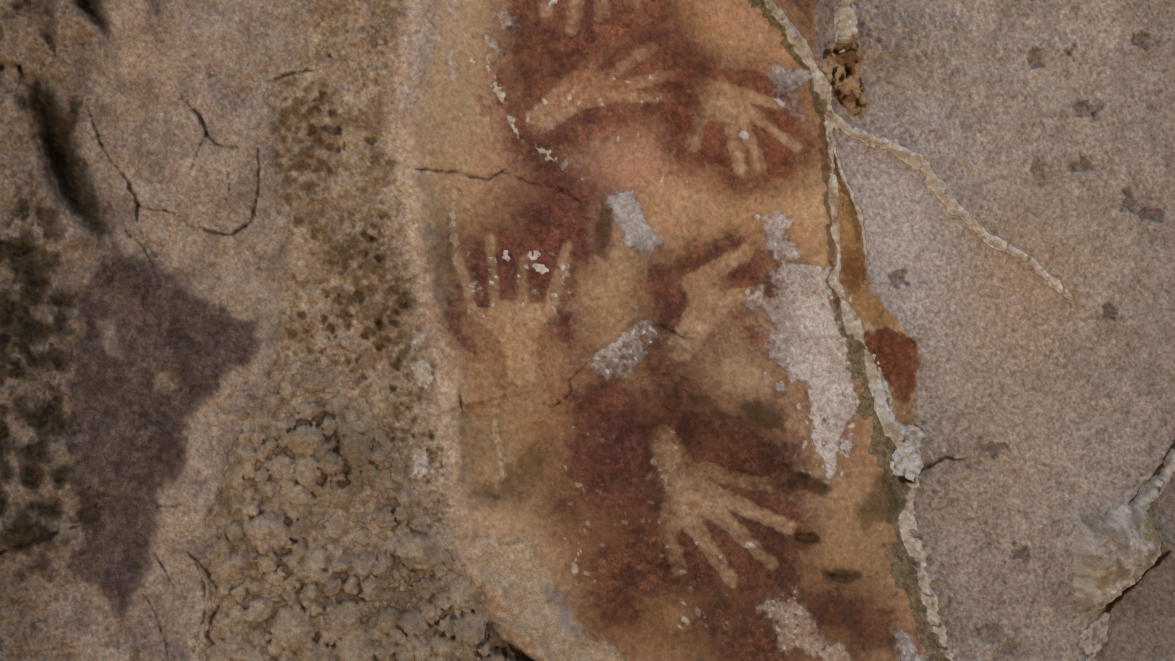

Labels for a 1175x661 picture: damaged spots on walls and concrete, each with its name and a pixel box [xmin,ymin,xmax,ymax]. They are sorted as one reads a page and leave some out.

spalling [604,190,665,255]
spalling [591,305,657,379]
spalling [745,210,857,483]
crack [749,0,1073,661]
crack [1129,439,1175,510]
spalling [755,585,851,661]
spalling [895,630,926,661]
crack [1080,613,1110,661]